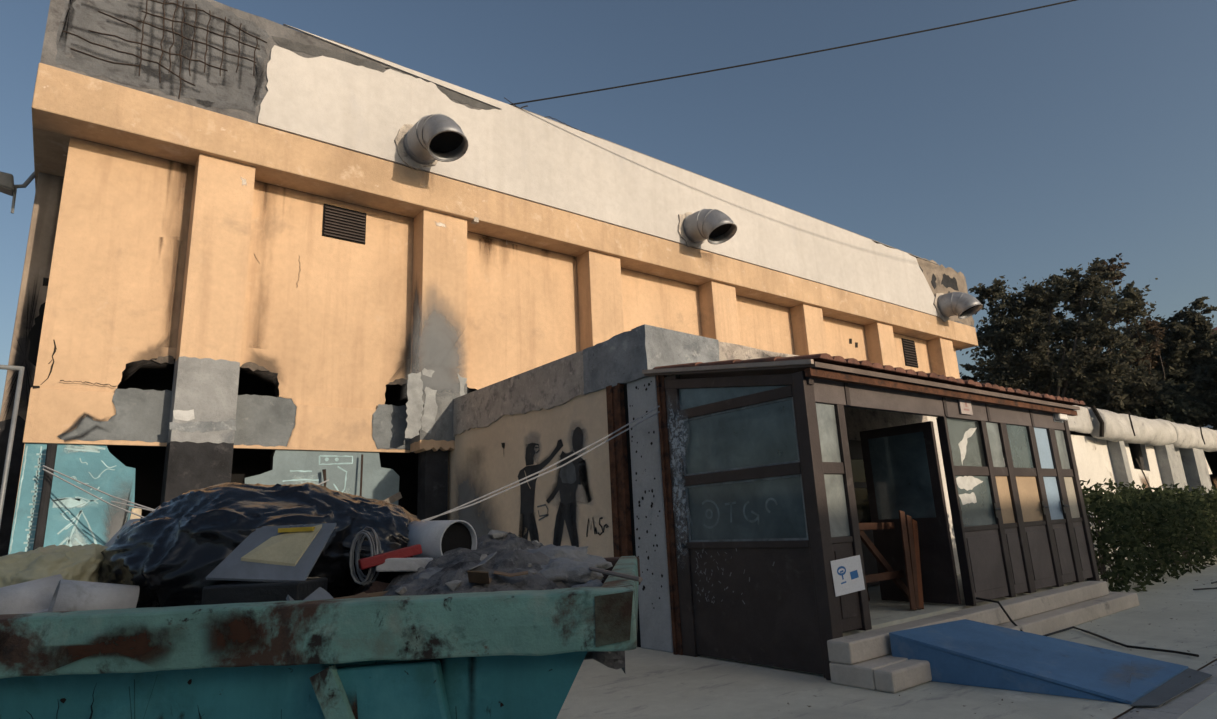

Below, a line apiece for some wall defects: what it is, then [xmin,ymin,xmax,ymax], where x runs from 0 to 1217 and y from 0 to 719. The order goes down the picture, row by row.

spalling [56,0,500,116]
crack [33,340,116,389]
peeling [151,355,269,444]